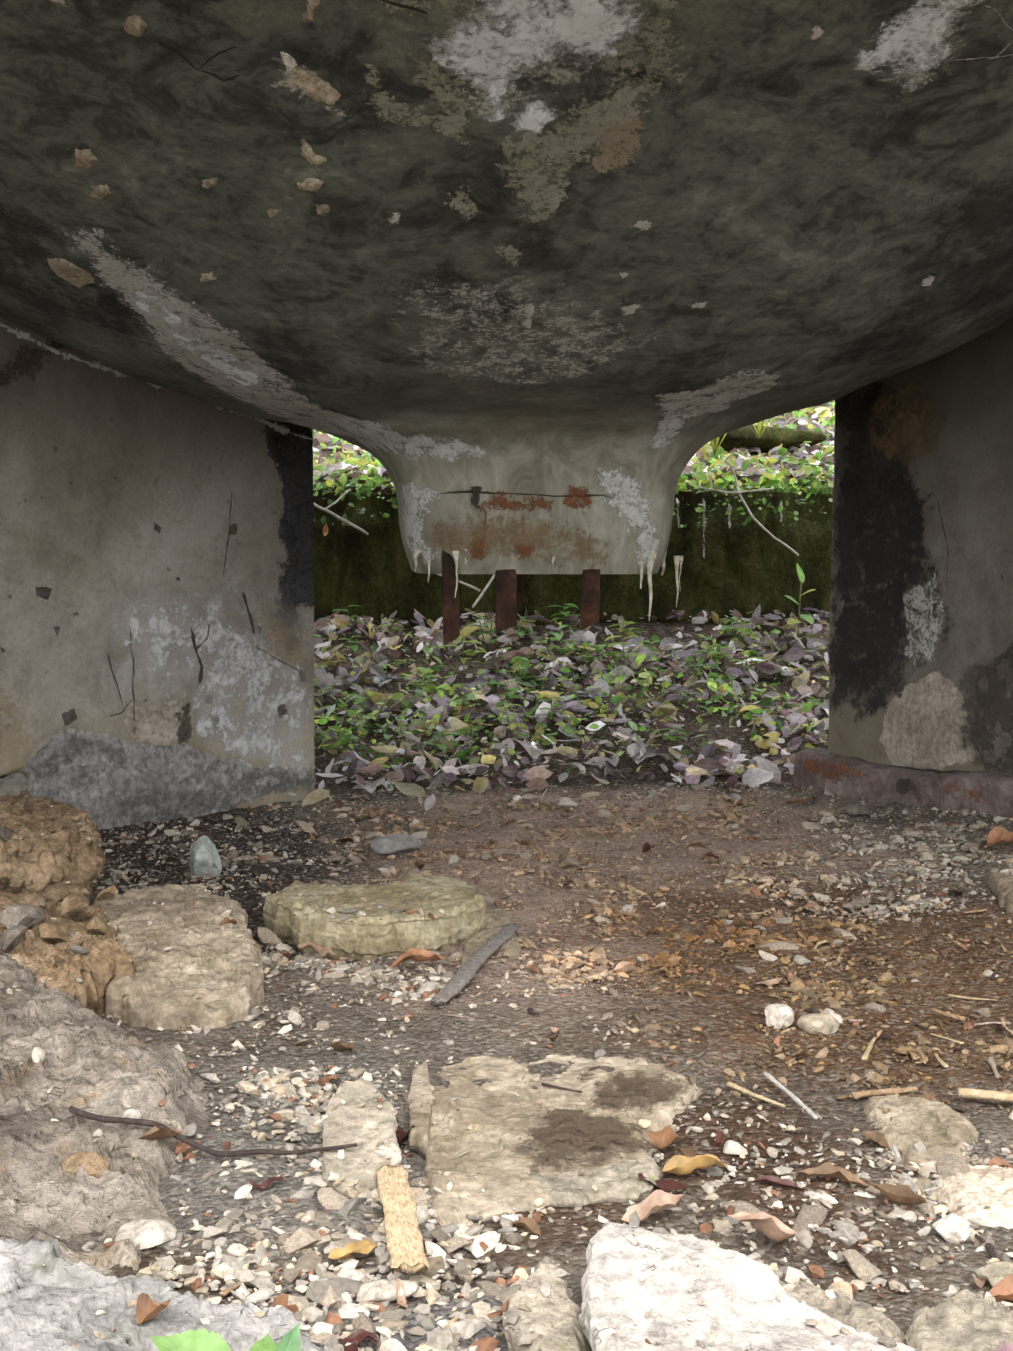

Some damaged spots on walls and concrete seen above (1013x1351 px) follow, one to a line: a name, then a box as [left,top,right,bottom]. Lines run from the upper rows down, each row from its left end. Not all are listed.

peeling [364,51,484,145]
damp [429,0,639,133]
peeling [496,0,691,224]
damp [857,0,974,91]
peeling [443,184,478,219]
peeling [491,243,522,267]
damp [54,225,491,655]
damp [400,481,606,568]
rust [471,486,592,559]
damp [595,467,660,566]
damp [828,382,949,721]
peeling [879,643,1013,775]